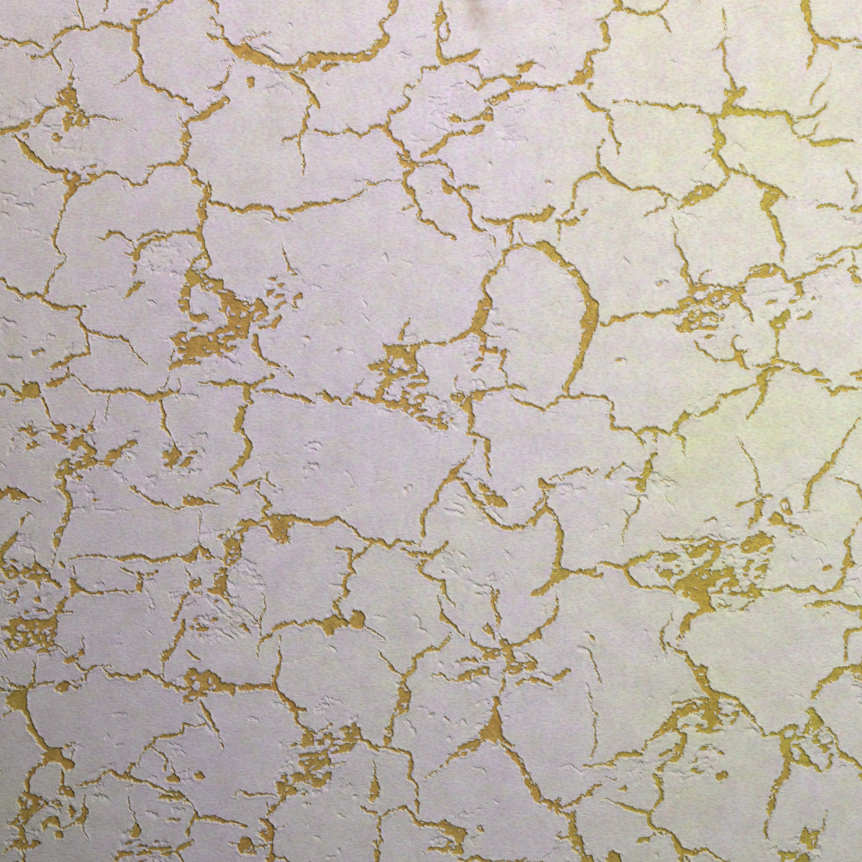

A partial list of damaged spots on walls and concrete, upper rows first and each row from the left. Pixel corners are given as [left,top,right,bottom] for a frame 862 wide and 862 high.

spalling [142,242,340,492]
crack [0,0,862,598]
spalling [366,305,528,479]
spalling [653,167,862,342]
spalling [0,396,156,660]
spalling [622,478,827,601]
spalling [227,696,381,862]
crack [0,542,731,862]
spalling [376,803,623,862]
spalling [676,850,691,862]
crack [644,416,862,841]